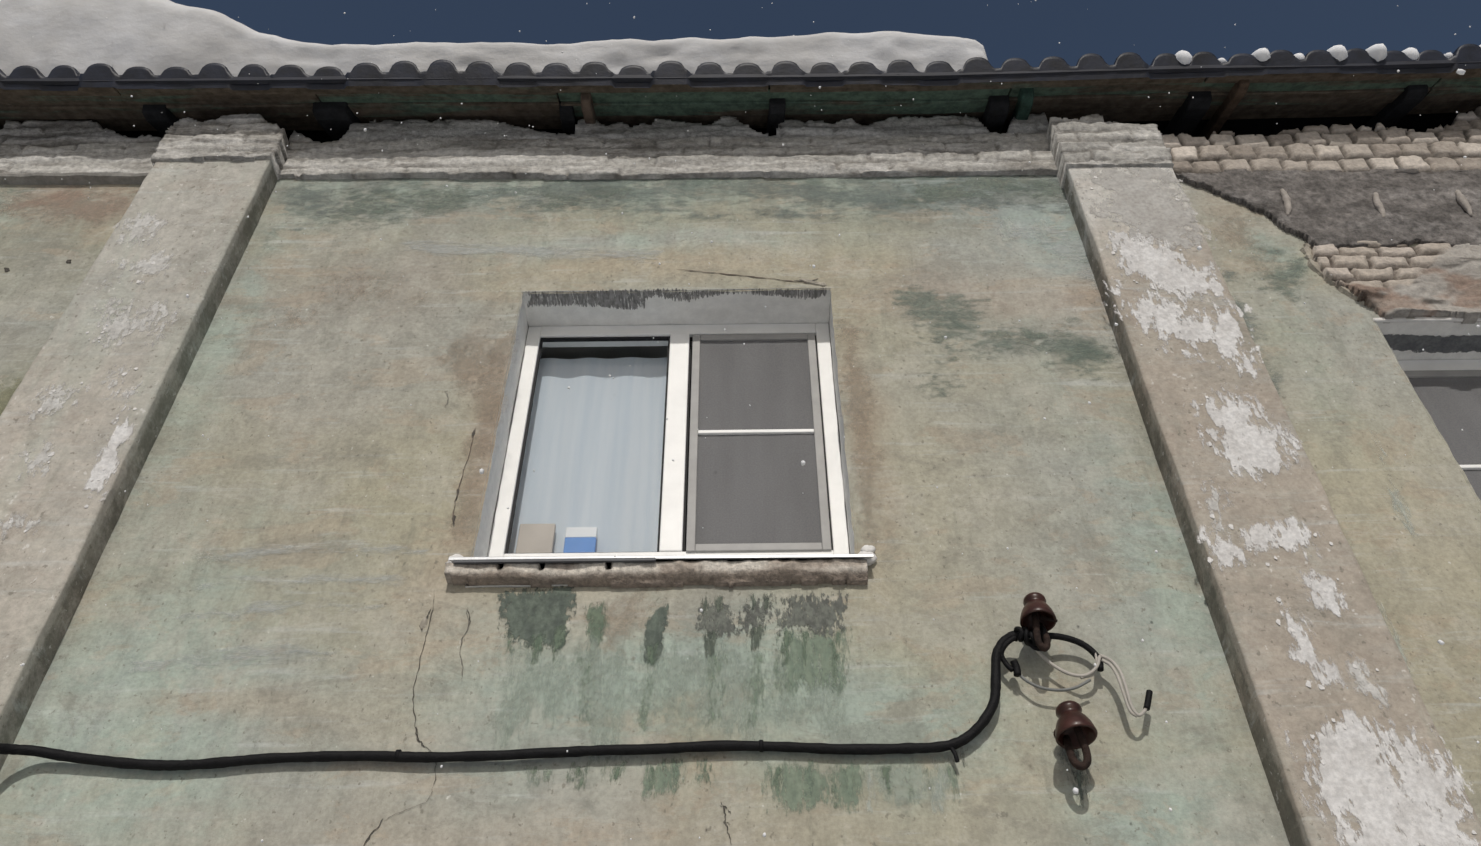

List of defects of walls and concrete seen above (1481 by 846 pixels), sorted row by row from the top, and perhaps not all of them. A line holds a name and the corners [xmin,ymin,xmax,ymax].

peeling [28,367,143,508]
crack [451,427,476,527]
peeling [1075,106,1481,846]
leakage [498,586,606,663]
leakage [644,604,669,665]
leakage [696,590,848,722]
crack [364,600,471,845]